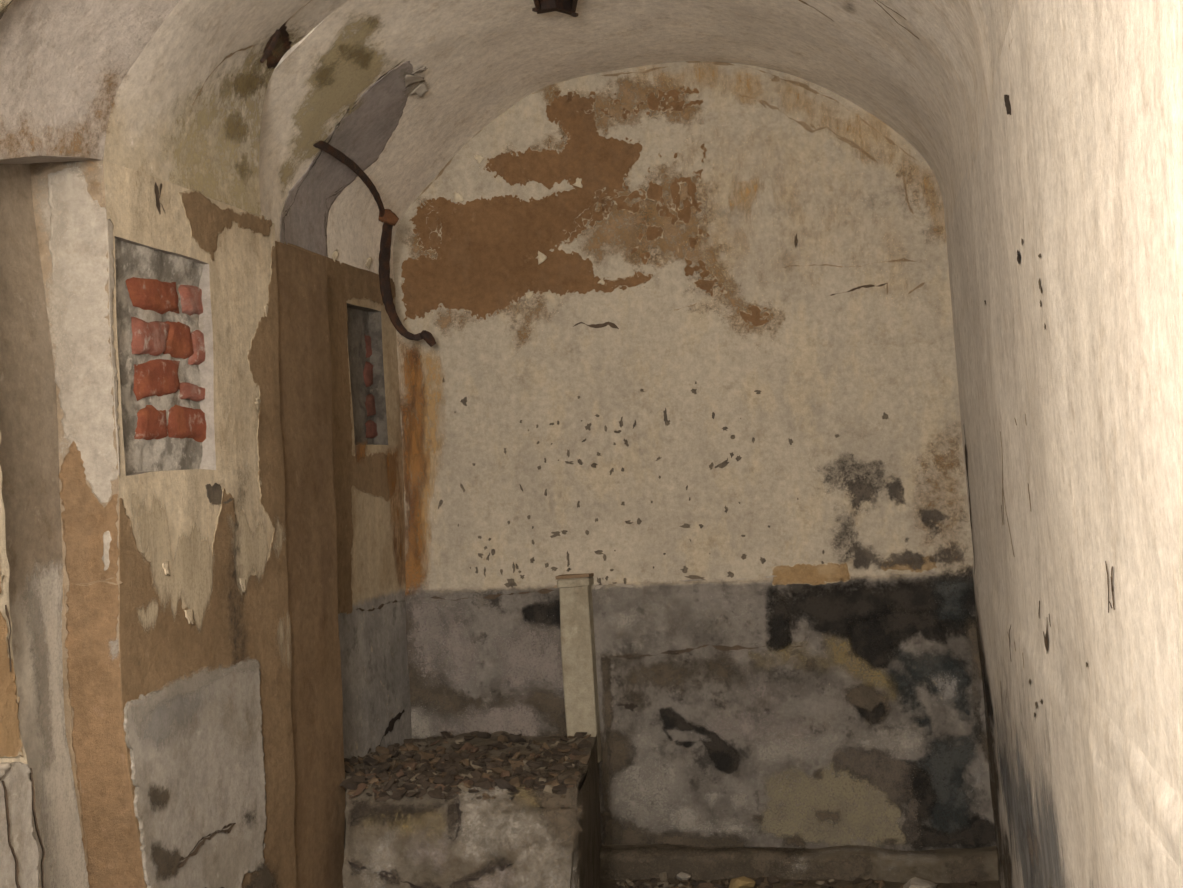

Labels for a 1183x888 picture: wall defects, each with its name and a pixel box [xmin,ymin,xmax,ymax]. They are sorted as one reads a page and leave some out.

rust [387,343,441,595]
flaking render [58,77,783,888]
peeling [0,611,45,888]
damp [349,800,441,826]
crack [348,858,514,888]
crack [447,794,462,841]
damp [457,765,587,888]
damp [600,589,838,848]
damp [748,439,1064,888]